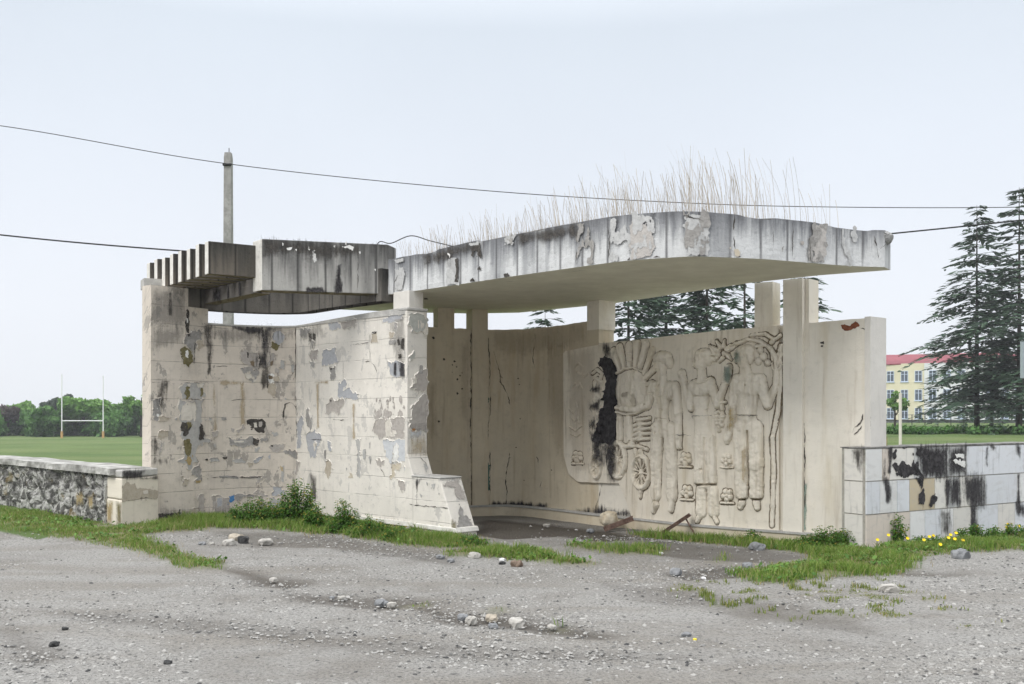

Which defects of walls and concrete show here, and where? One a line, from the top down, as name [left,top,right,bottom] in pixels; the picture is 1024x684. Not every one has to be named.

leakage [262,239,361,294]
spalling [608,209,658,262]
spalling [682,209,711,256]
spalling [800,222,828,263]
peeling [371,298,435,344]
leakage [235,327,270,388]
peeling [299,326,360,416]
flaking render [150,360,440,519]
crack [470,334,510,505]
leakage [589,343,618,480]
leakage [883,438,987,533]
leakage [1016,474,1024,515]